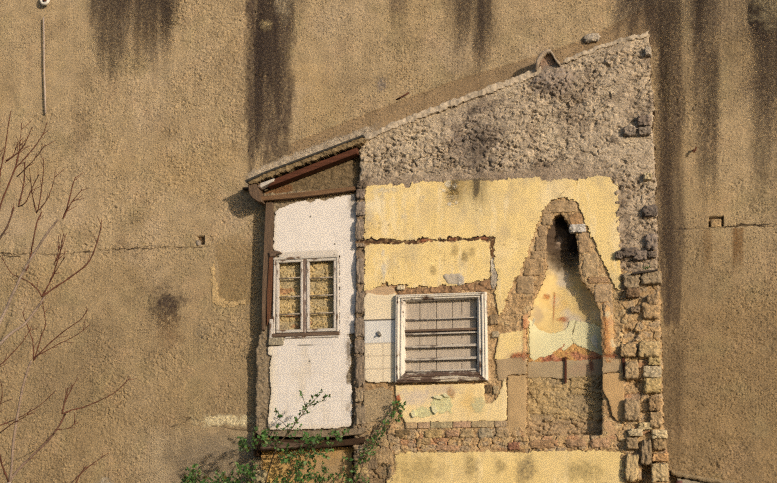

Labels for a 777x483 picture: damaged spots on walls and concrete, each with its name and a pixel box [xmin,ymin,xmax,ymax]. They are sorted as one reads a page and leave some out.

damp [246,0,294,162]
damp [618,0,684,324]
spalling [382,265,492,295]
peeling [527,317,602,362]